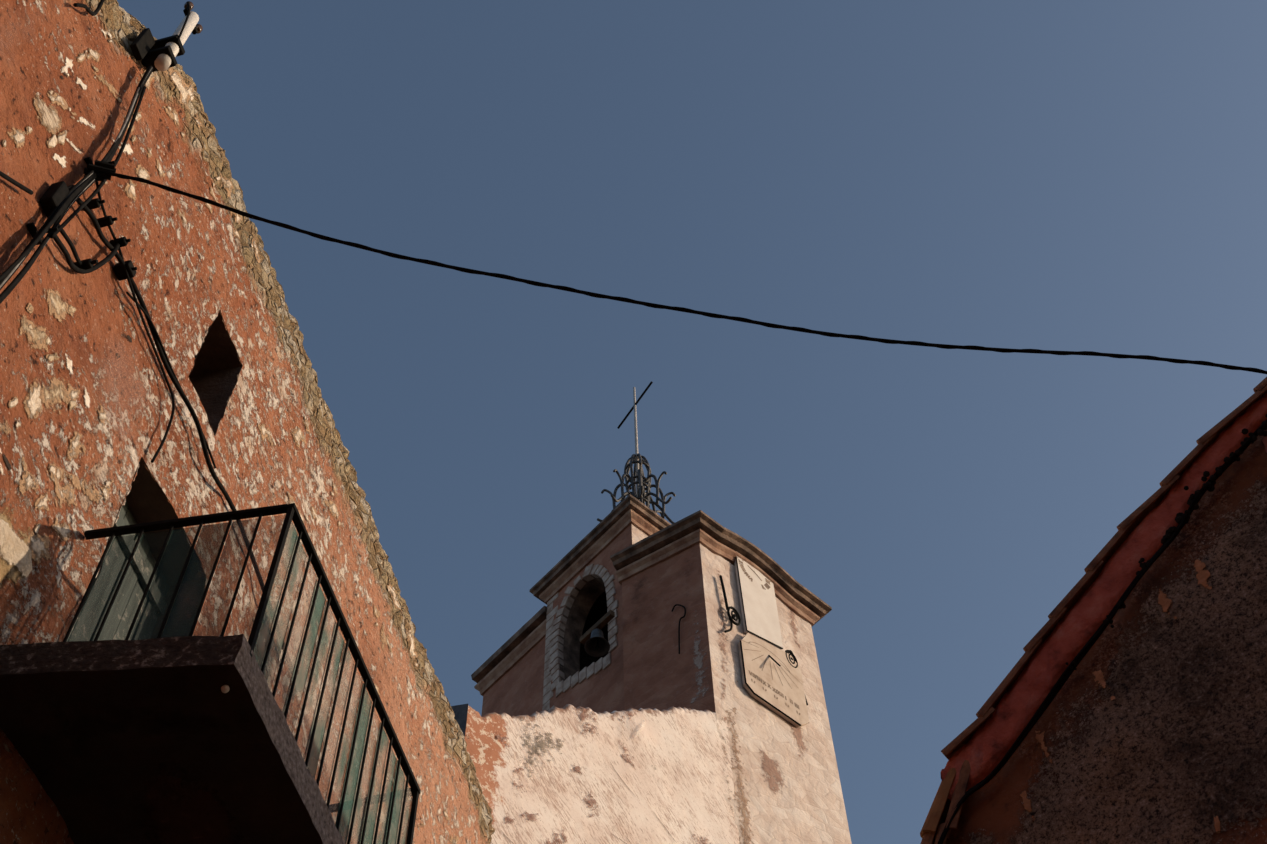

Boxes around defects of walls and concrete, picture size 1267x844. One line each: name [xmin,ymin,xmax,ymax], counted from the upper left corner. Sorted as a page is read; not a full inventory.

spalling [60,48,122,102]
spalling [2,90,96,168]
peeling [119,111,165,201]
spalling [0,289,110,434]
peeling [19,431,114,565]
peeling [505,812,539,824]